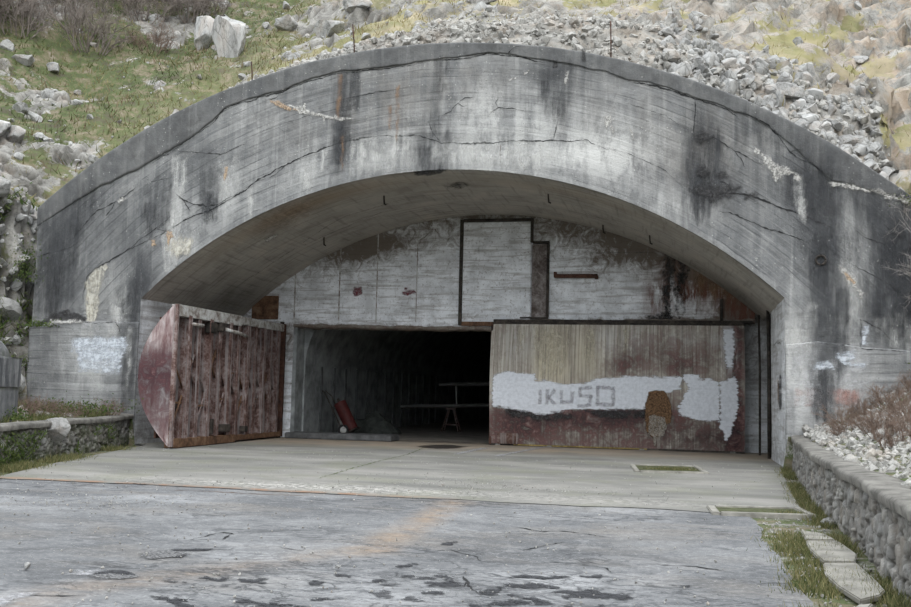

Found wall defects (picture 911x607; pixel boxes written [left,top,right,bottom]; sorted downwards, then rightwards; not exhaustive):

crack [444,46,543,63]
crack [37,65,832,292]
spalling [38,265,107,326]
rust [661,255,690,319]